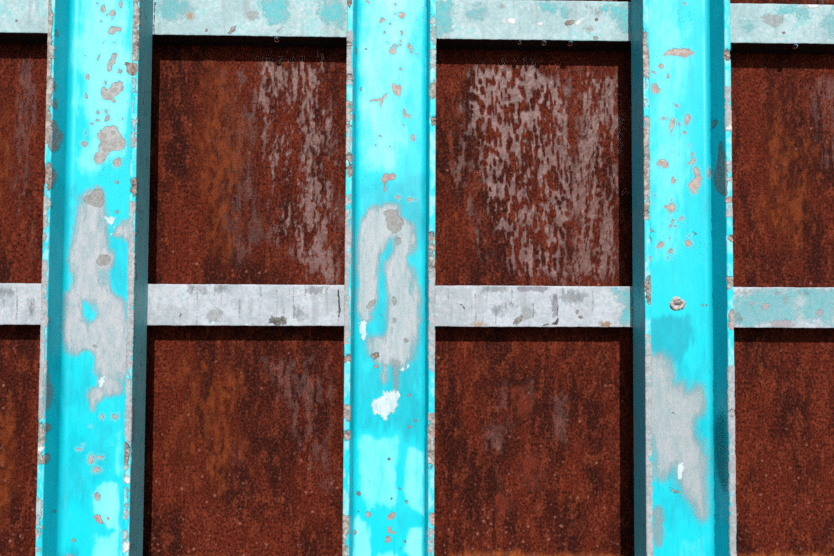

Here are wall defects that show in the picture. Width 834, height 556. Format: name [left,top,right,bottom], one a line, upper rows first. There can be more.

spalling [101,0,140,103]
spalling [642,28,669,94]
peeling [81,110,126,167]
rust [197,59,247,264]
spalling [643,128,673,259]
peeling [688,141,728,196]
rust [760,123,819,247]
peeling [63,186,129,419]
peeling [356,195,422,420]
rust [0,401,17,525]
rust [205,367,247,494]
peeling [651,354,707,519]